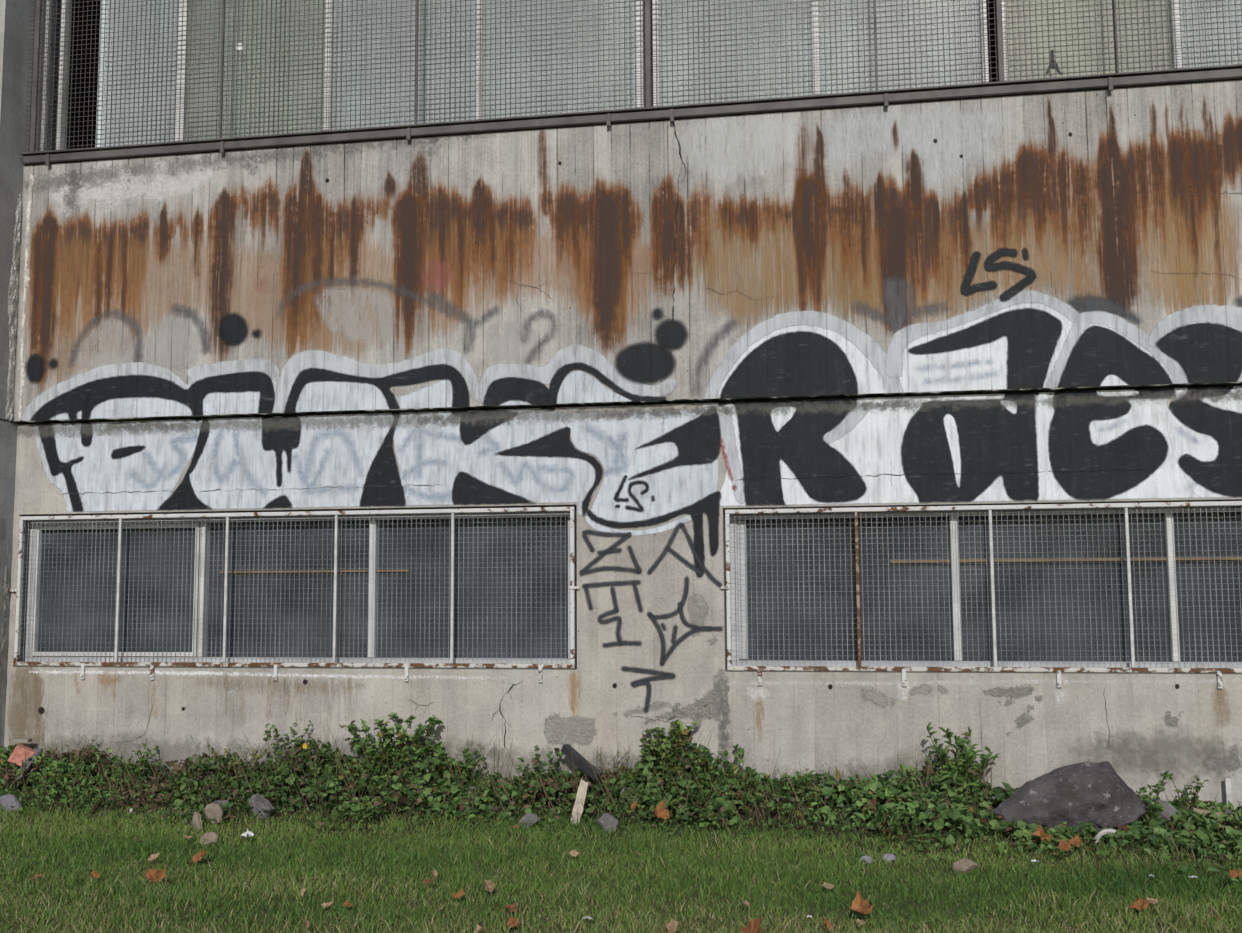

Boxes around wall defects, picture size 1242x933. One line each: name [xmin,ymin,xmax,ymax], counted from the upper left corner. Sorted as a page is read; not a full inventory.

rust [30,100,1242,383]
crack [636,122,686,320]
crack [492,681,522,747]